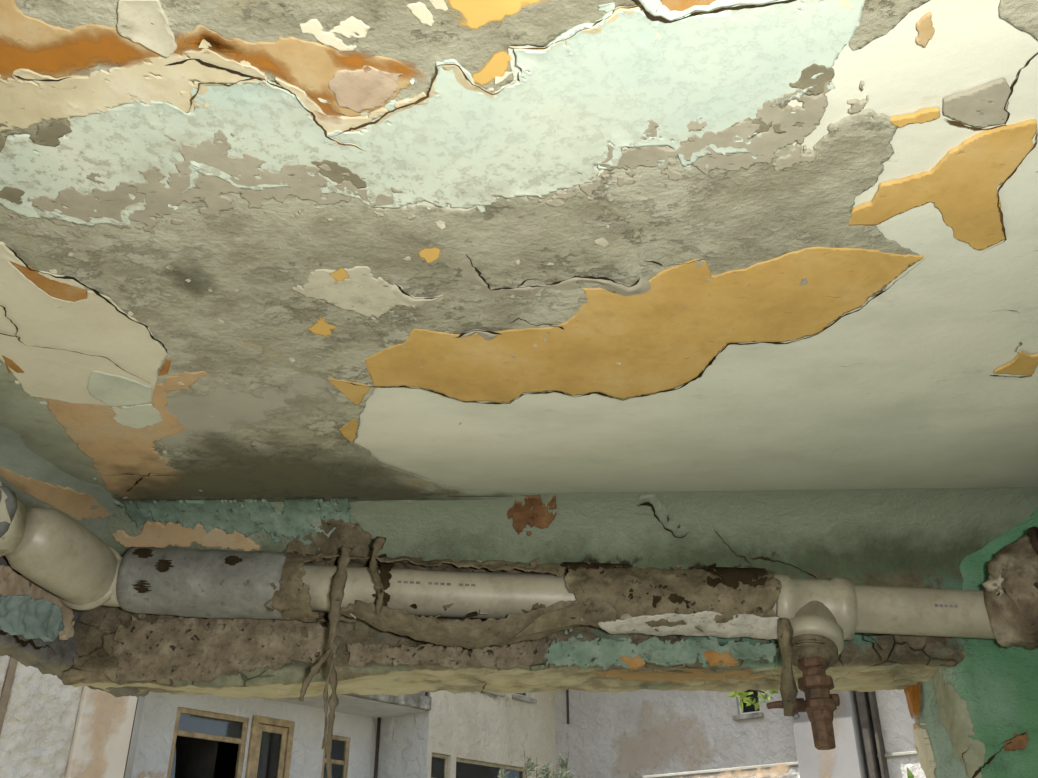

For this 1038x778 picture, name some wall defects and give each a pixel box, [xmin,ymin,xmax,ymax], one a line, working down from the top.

crack [1004,53,1038,125]
crack [391,282,444,307]
flaking render [0,0,1038,565]
crack [456,252,704,340]
flaking render [0,565,75,640]
flaking render [112,614,780,685]
flaking render [913,723,936,778]
peeling [931,668,987,778]